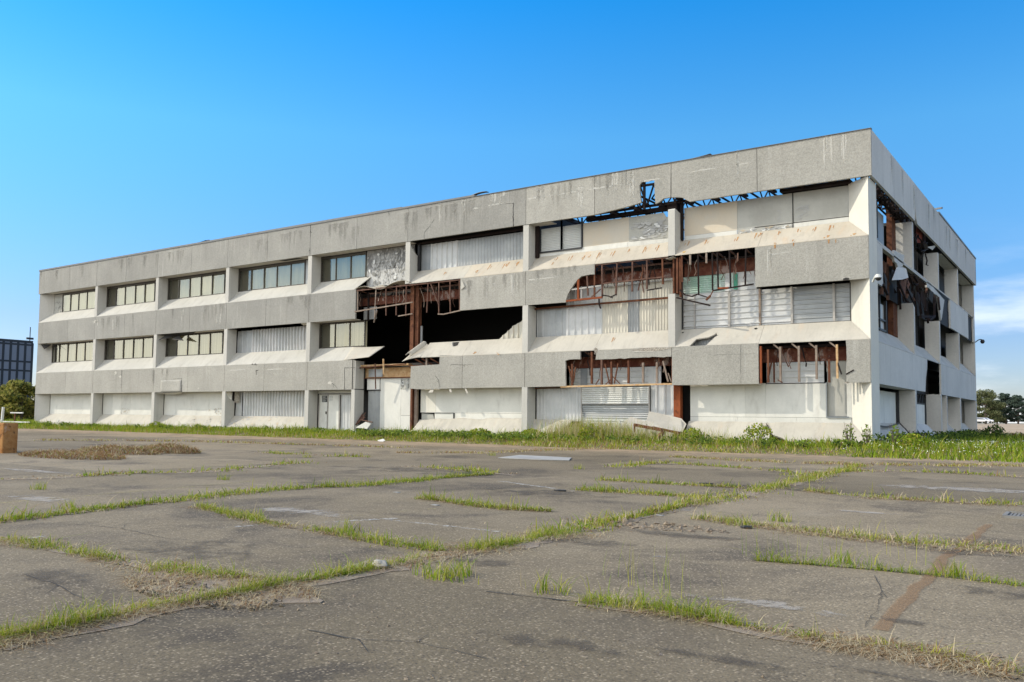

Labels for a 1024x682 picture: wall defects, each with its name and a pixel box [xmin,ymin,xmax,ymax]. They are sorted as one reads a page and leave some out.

peeling [367,248,414,286]